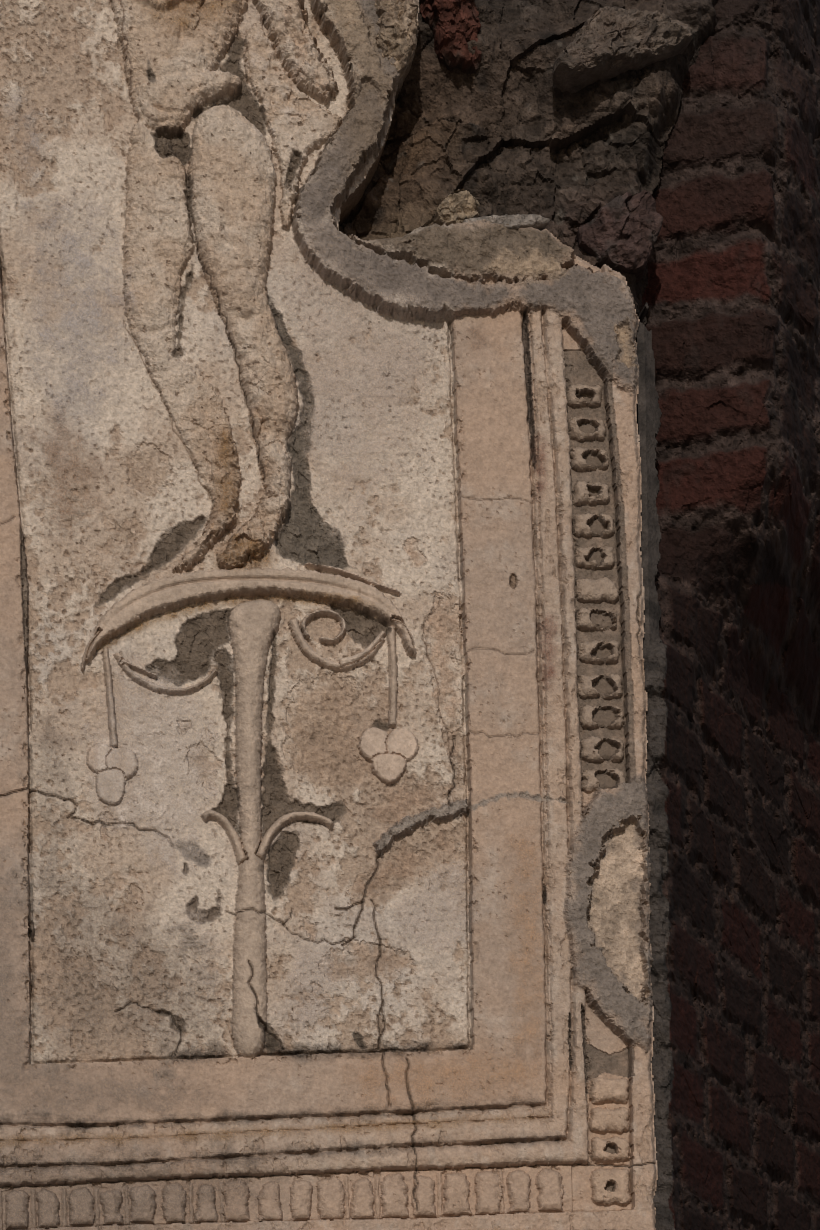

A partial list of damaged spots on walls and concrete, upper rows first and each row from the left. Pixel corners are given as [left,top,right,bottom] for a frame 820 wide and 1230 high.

spalling [146,61,157,84]
spalling [151,31,267,243]
spalling [284,148,303,191]
flaking render [349,219,576,285]
spalling [20,526,30,690]
crack [0,789,174,848]
crack [227,600,582,1211]
flaking render [586,813,653,1009]
crack [115,1002,182,1056]